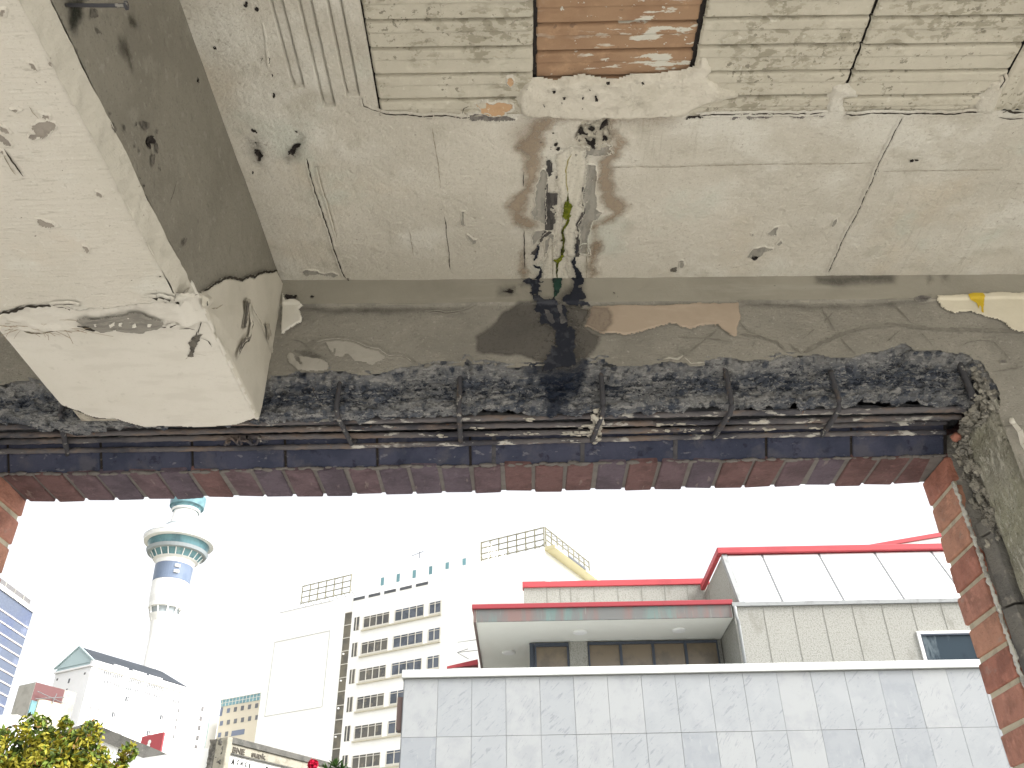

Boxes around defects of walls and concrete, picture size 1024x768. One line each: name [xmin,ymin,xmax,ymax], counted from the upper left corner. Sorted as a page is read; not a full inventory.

crack [826,73,1024,273]
crack [304,159,350,281]
water stain [477,119,625,371]
spalling [0,301,211,359]
peeling [149,292,198,306]
crack [204,270,278,291]
peeling [585,302,741,337]
peeling [937,292,1024,333]
spalling [0,343,1000,460]
peeling [1009,417,1024,449]